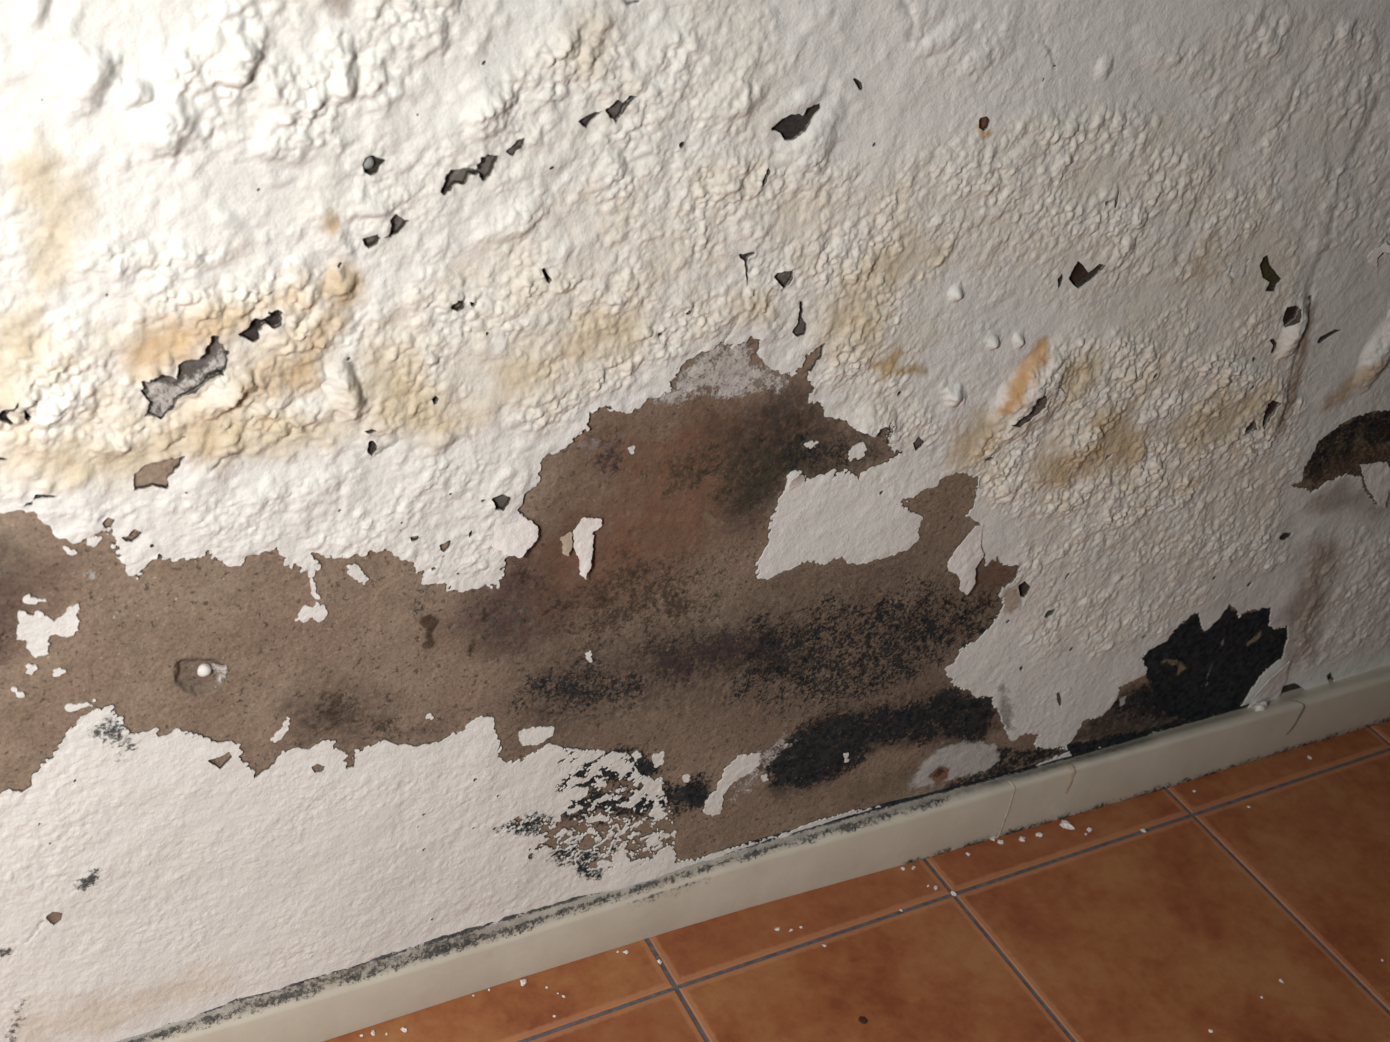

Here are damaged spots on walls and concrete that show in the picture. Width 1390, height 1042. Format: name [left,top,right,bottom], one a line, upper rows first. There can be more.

spalling [1283,306,1296,323]
peeling [1292,410,1390,508]
peeling [0,335,1302,868]
leakage [493,812,558,836]
spalling [46,912,62,923]